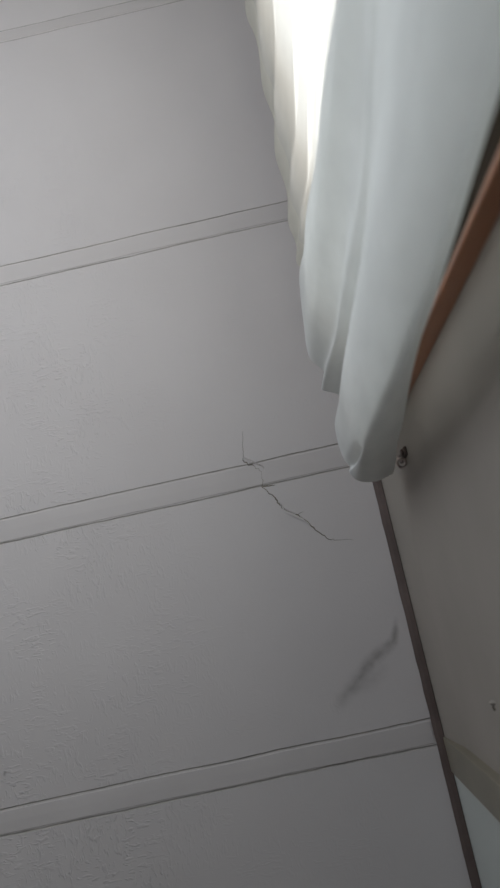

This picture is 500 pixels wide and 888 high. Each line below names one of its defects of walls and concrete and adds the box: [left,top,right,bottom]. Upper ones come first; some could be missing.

crack [242,433,351,540]